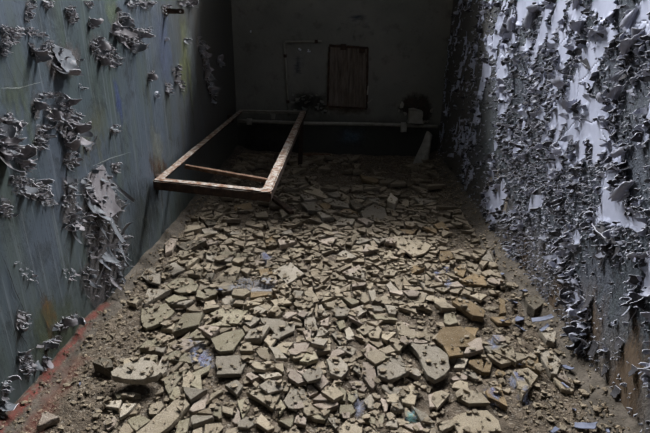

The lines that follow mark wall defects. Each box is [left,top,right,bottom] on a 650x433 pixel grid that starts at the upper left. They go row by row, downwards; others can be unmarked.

peeling [0,0,88,91]
peeling [88,0,199,68]
peeling [0,92,136,307]
peeling [438,0,650,401]
peeling [0,311,86,419]